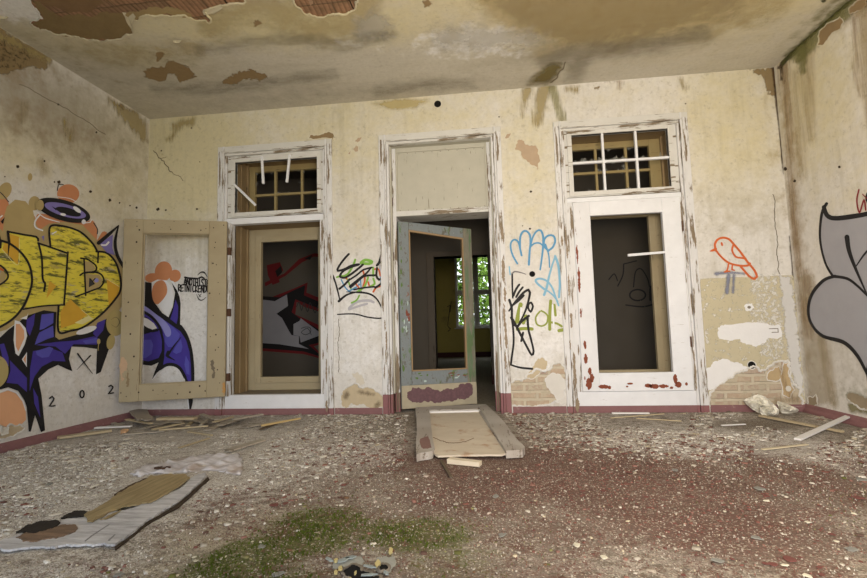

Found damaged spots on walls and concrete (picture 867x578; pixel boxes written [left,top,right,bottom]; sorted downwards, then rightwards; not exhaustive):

spalling [29,0,246,43]
spalling [292,0,359,19]
peeling [817,0,867,46]
peeling [143,52,197,82]
damp [750,0,867,96]
peeling [504,133,541,171]
peeling [561,236,581,296]
peeling [498,259,508,369]
spalling [645,275,818,407]
spalling [339,371,383,409]
spalling [511,341,611,413]